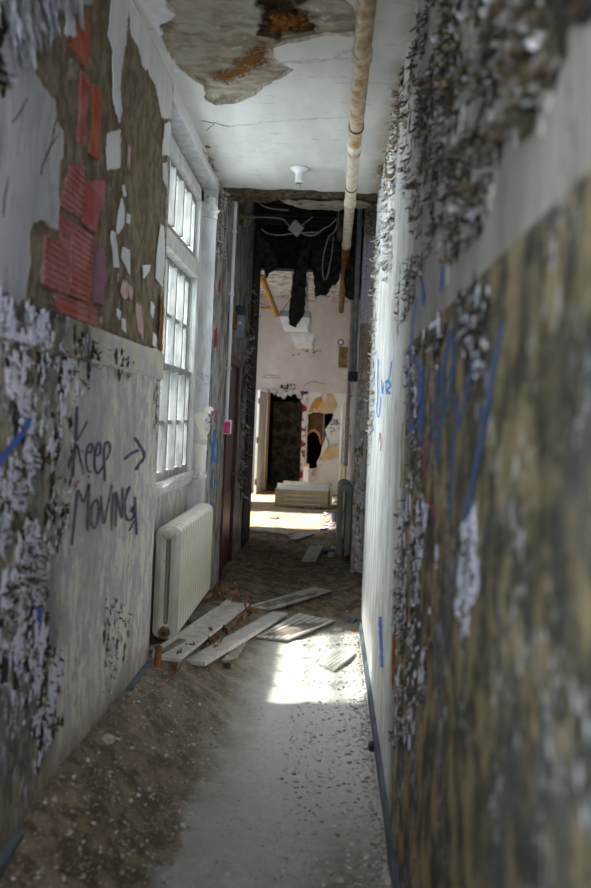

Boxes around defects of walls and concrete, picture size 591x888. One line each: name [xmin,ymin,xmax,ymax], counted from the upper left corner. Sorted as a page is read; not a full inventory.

flaking render [0,0,356,777]
corrosion [209,10,318,85]
water stain [255,0,316,40]
peeling [387,272,492,751]
peeling [343,0,591,570]